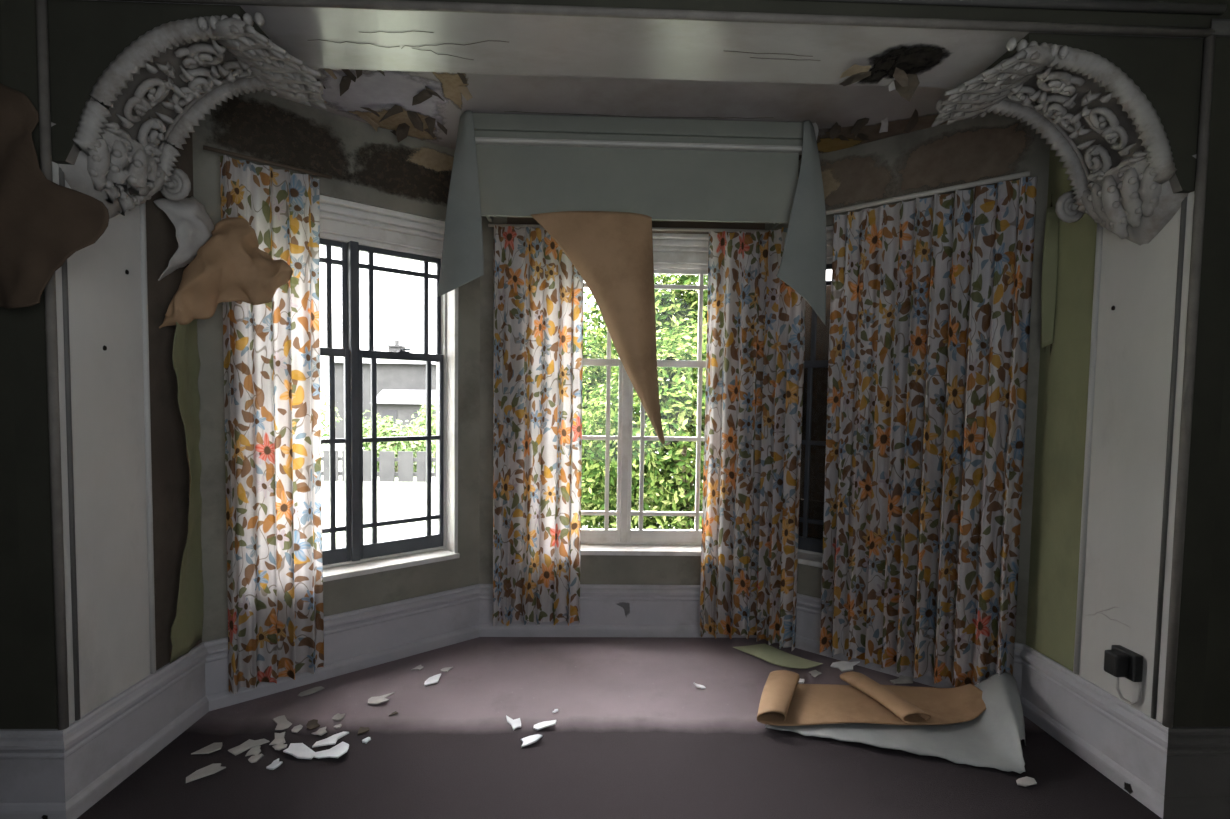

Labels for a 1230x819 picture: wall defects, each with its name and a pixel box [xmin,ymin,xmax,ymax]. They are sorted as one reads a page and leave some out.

crack [307,31,506,60]
peeling [317,69,473,143]
flaking render [812,44,992,152]